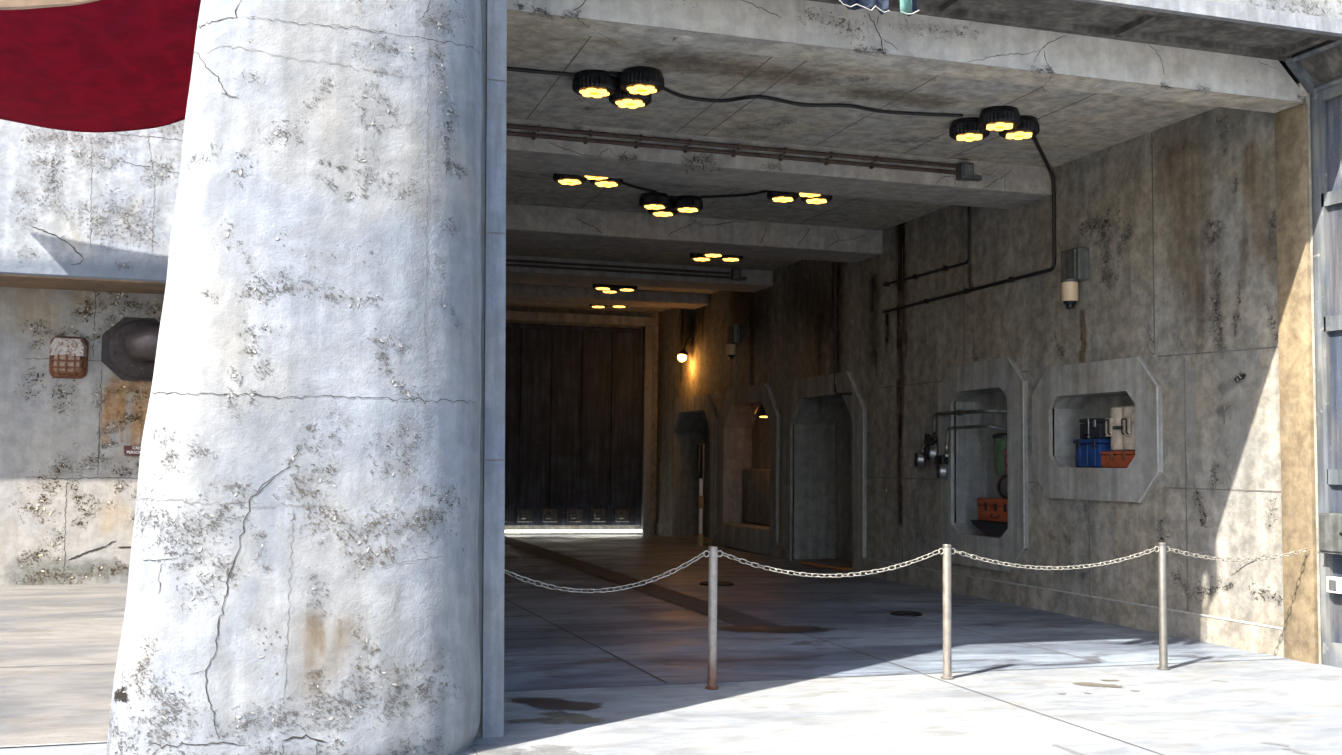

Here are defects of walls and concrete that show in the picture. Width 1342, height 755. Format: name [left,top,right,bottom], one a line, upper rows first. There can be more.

crack [194,0,480,98]
crack [152,392,475,404]
crack [69,541,175,593]
crack [136,447,329,749]
water stain [506,697,606,724]
crack [282,735,325,754]